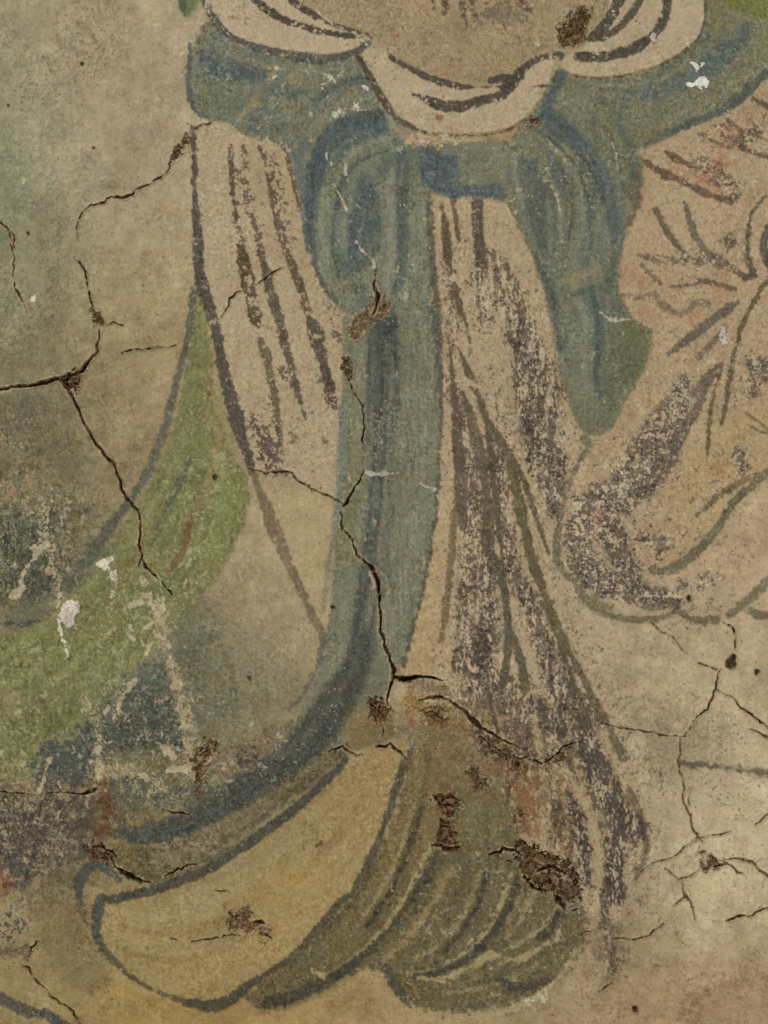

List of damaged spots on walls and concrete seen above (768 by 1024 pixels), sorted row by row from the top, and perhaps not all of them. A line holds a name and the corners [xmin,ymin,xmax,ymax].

crack [185,122,213,137]
spalling [534,4,594,52]
peeling [686,61,710,91]
crack [371,269,379,293]
crack [0,161,177,598]
peeling [0,430,81,658]
crack [248,382,581,764]
peeling [82,536,225,799]
spalling [427,790,466,853]
spalling [488,803,589,913]
crack [577,621,768,942]
crack [594,982,614,996]